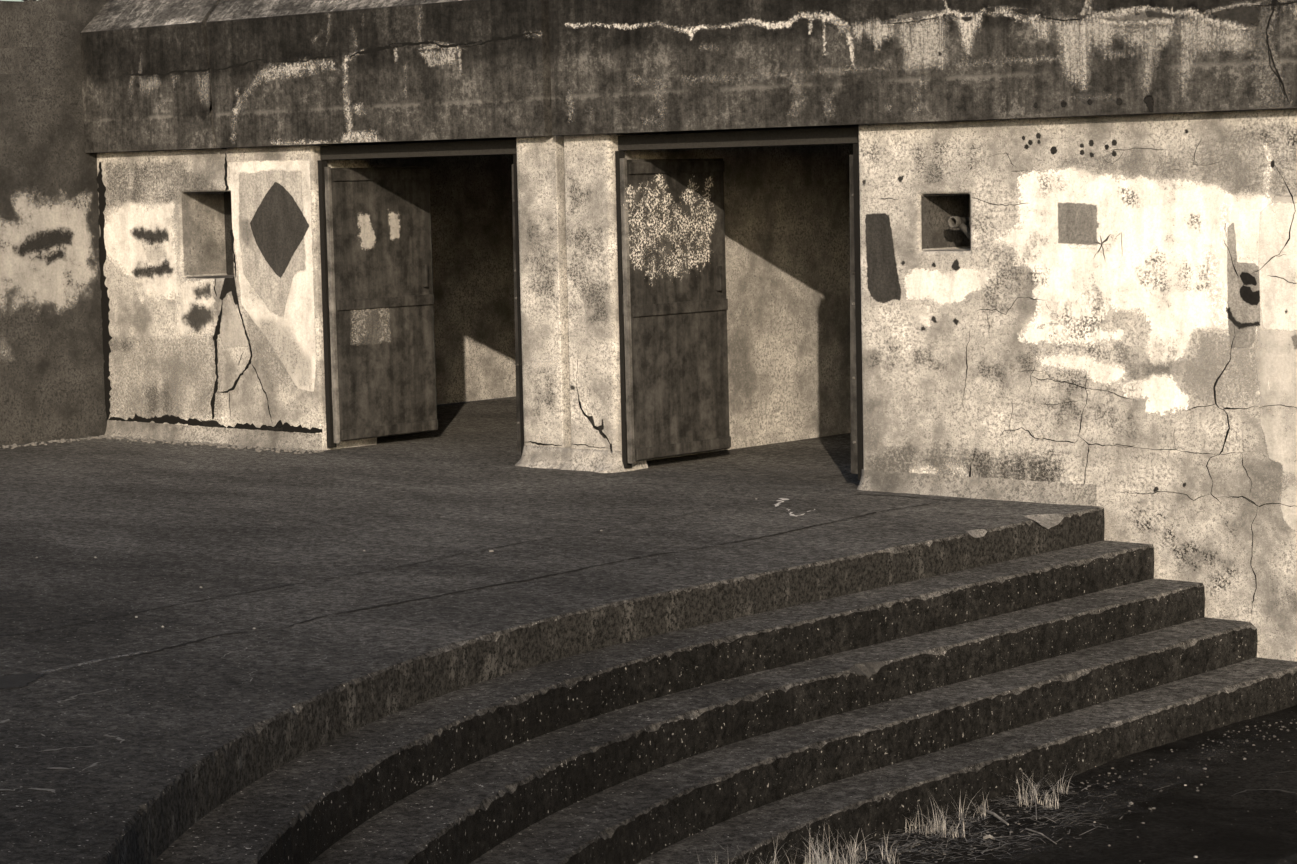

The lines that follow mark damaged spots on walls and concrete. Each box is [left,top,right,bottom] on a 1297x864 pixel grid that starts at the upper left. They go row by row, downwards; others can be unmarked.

leakage [667,13,986,112]
crack [1081,0,1091,15]
leakage [1015,17,1245,85]
crack [1250,0,1297,109]
peeling [0,194,95,309]
crack [221,148,229,191]
crack [210,230,272,422]
crack [962,297,1049,415]
peeling [993,133,1272,416]
crack [1224,160,1297,284]
crack [0,327,1296,792]